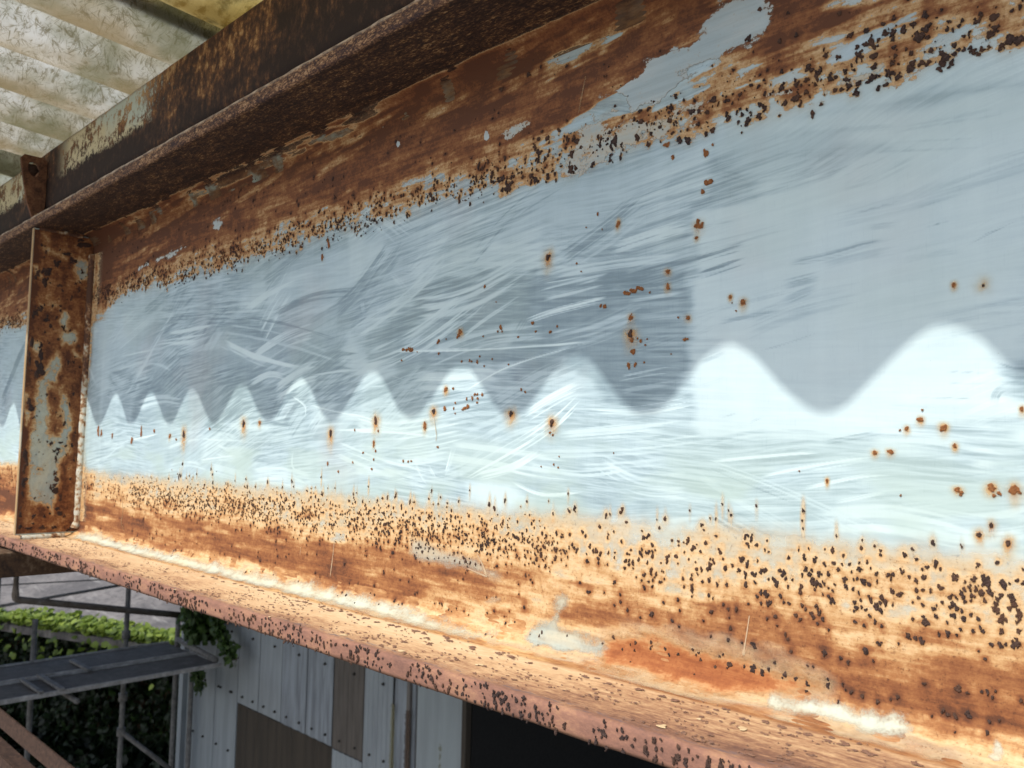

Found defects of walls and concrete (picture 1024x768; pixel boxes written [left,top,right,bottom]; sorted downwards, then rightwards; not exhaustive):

corrosion [84,0,732,327]
peeling [558,0,773,179]
corrosion [581,0,1024,164]
corrosion [0,259,31,333]
corrosion [0,462,18,523]
corrosion [16,229,1024,768]